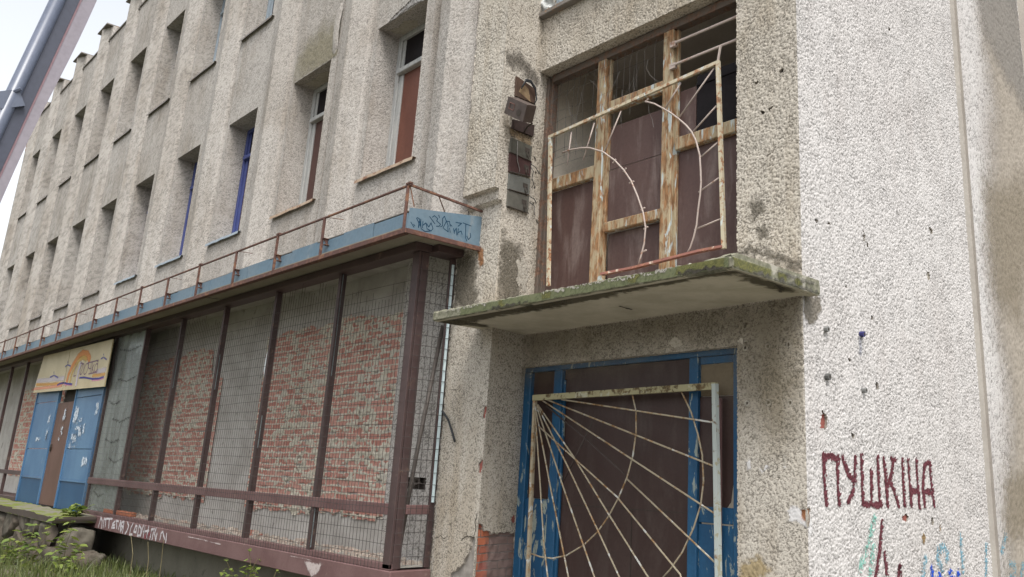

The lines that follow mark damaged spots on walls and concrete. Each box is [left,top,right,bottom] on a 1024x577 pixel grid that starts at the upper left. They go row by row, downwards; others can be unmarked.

leakage [439,241,822,327]
flaking render [450,514,516,577]